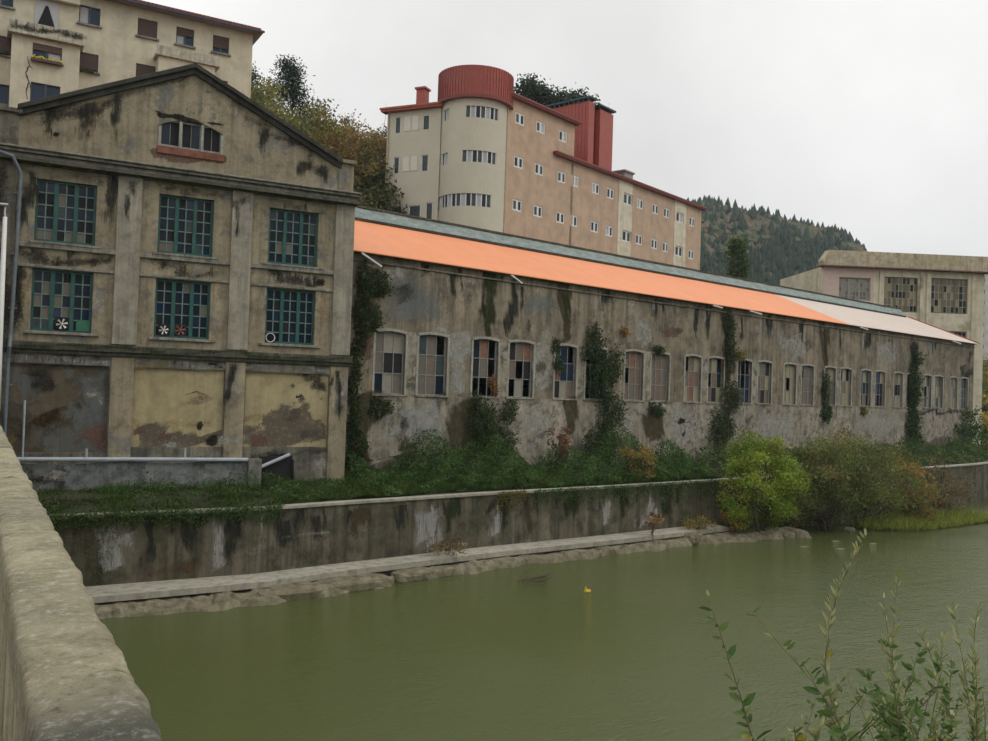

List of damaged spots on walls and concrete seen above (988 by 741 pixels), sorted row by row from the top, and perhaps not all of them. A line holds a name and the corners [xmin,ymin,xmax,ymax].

water stain [40,77,187,141]
water stain [503,277,547,335]
spalling [134,421,222,447]
spalling [244,394,326,447]
water stain [94,516,157,571]
water stain [168,513,242,567]
water stain [260,507,327,550]
water stain [395,497,461,547]
water stain [487,495,510,537]
water stain [602,485,681,528]